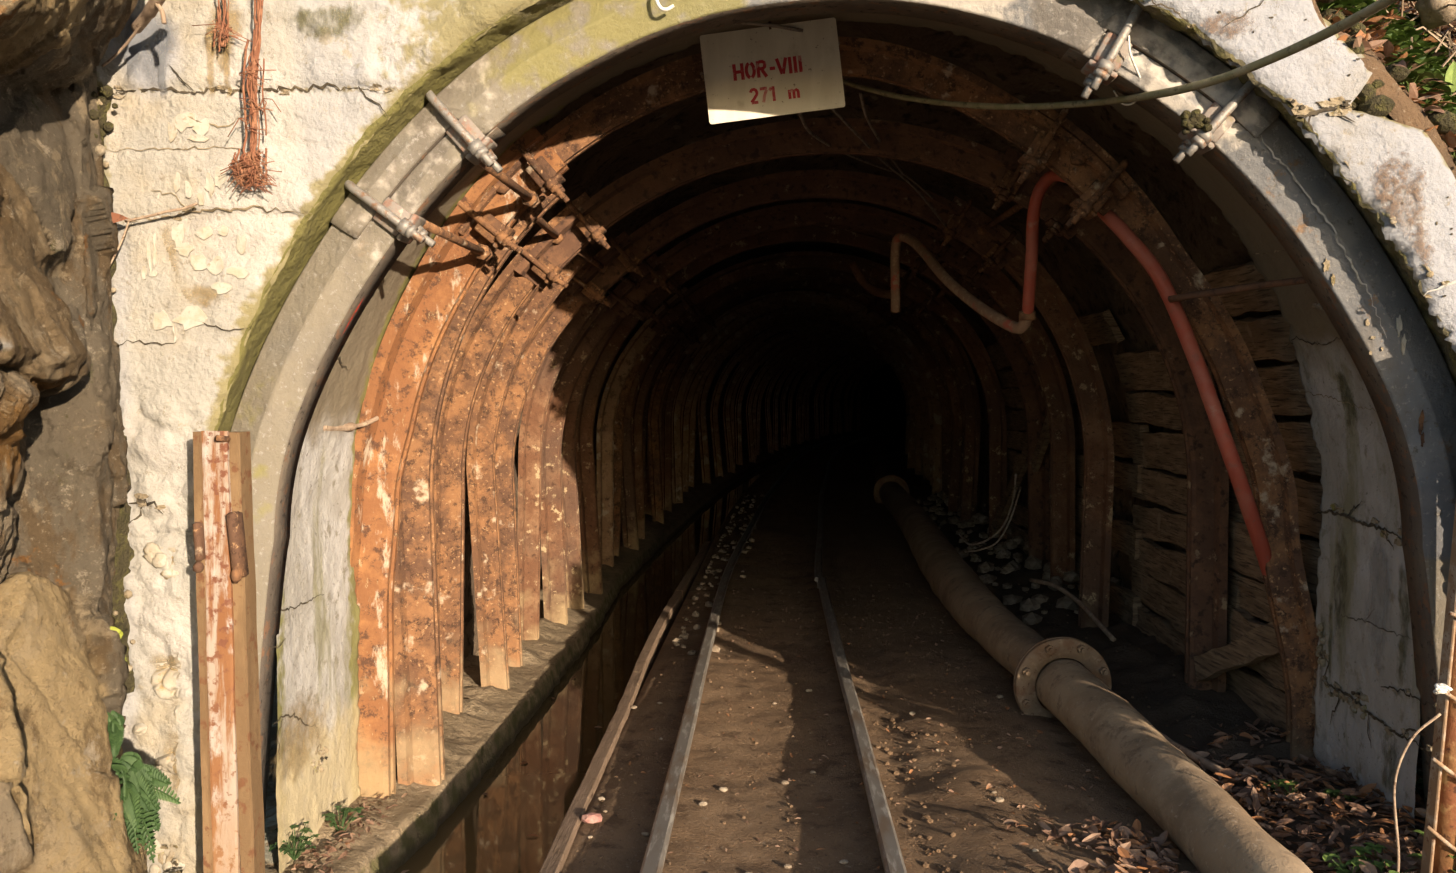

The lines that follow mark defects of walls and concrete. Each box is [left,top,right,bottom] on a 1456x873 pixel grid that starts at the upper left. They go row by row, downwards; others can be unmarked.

peeling [168,112,210,143]
crack [105,65,392,152]
peeling [173,167,227,206]
crack [115,190,311,257]
peeling [142,223,249,295]
peeling [153,305,208,344]
crack [1313,501,1402,550]
crack [1321,649,1436,757]